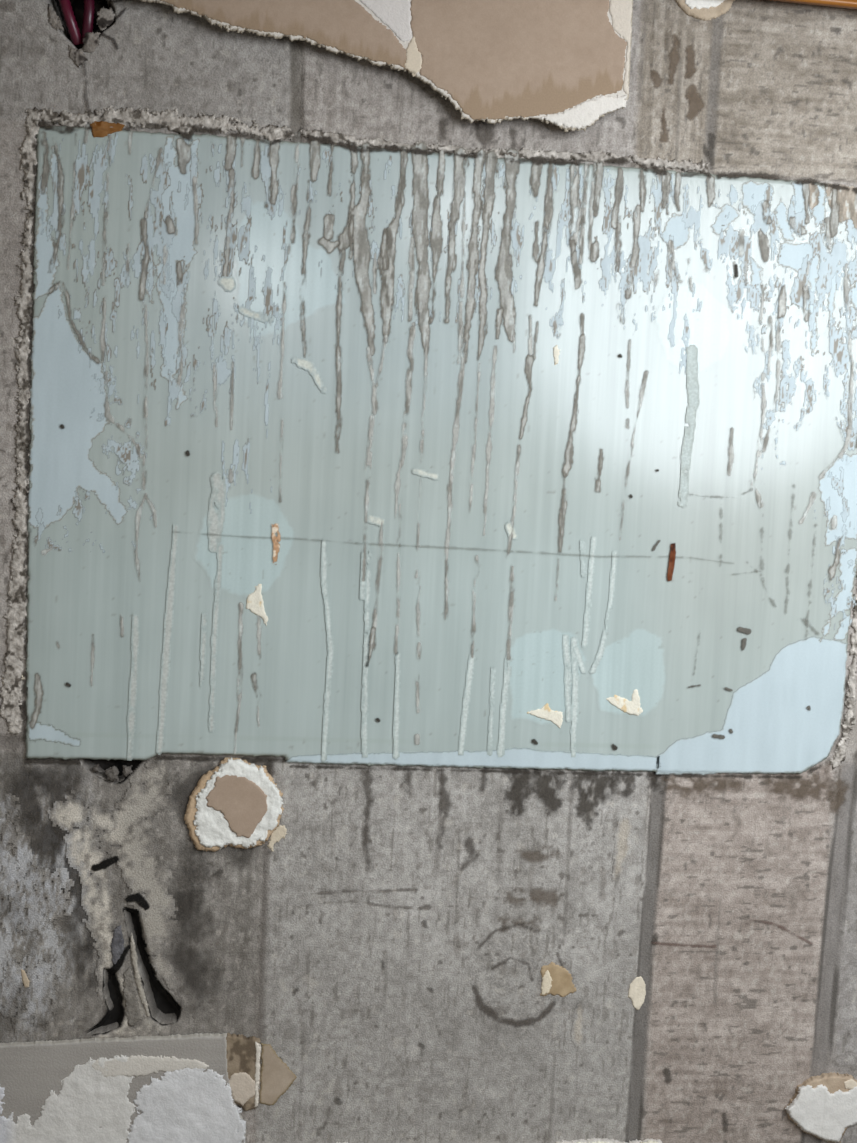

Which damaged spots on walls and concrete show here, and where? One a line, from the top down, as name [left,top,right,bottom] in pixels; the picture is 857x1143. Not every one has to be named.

spalling [48,0,115,68]
crack [126,123,481,158]
crack [511,157,857,193]
water stain [570,161,646,299]
water stain [218,120,553,762]
peeling [288,156,857,775]
rust [271,524,280,565]
rust [667,543,676,581]
water stain [0,524,206,1042]
water stain [506,768,635,825]
spalling [267,825,287,852]
crack [88,893,181,1035]